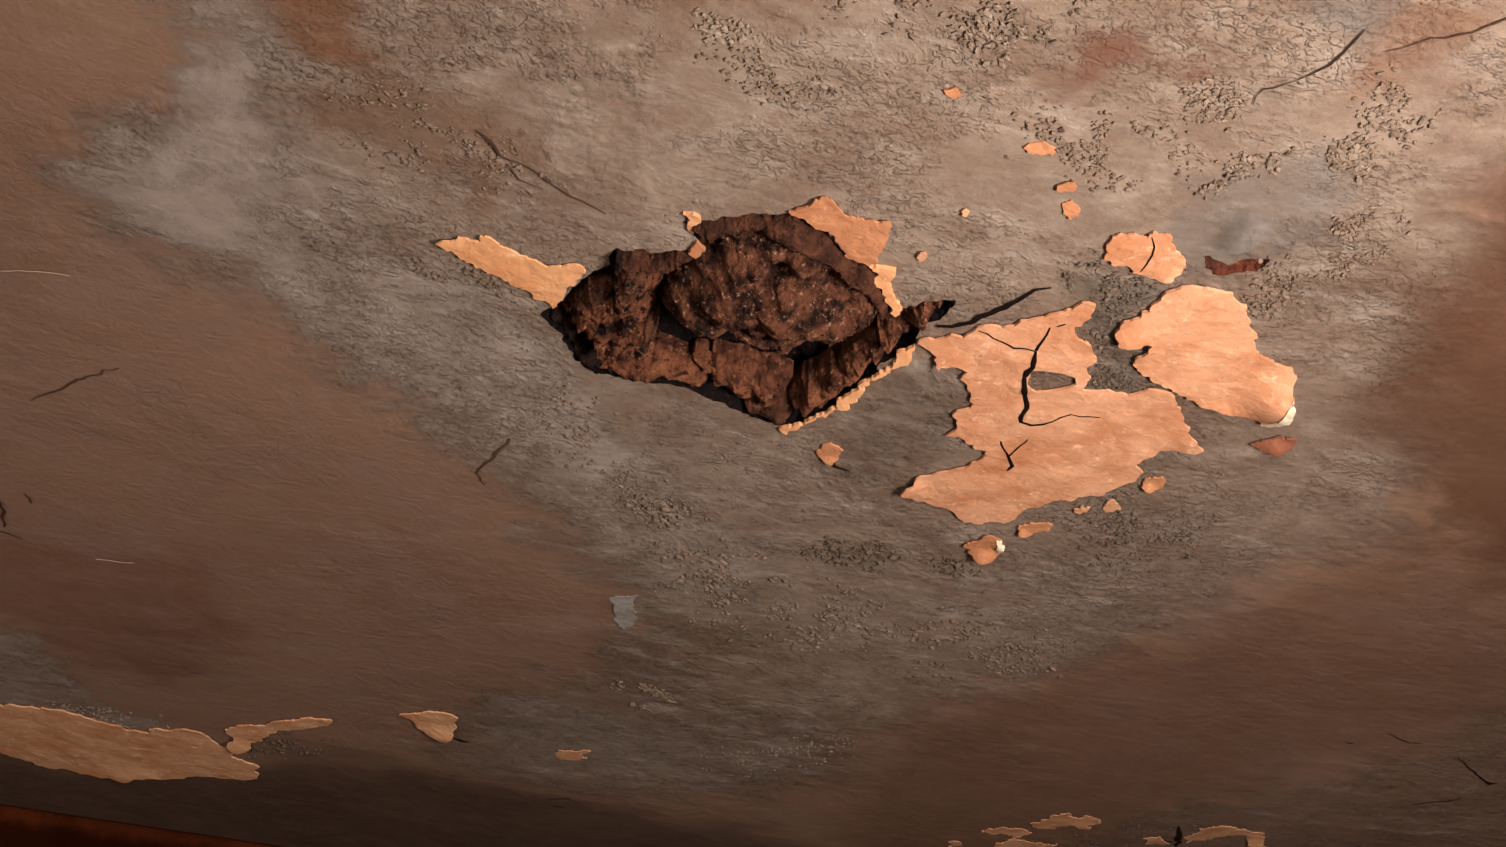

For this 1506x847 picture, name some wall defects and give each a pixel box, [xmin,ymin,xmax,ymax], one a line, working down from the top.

crack [1253,18,1506,105]
crack [937,287,1051,328]
damp [1028,371,1076,391]
spalling [413,196,1390,654]
damp [489,449,657,588]
damp [0,632,158,729]
peeling [0,701,333,783]
peeling [399,710,458,743]
peeling [982,813,1101,847]
peeling [1143,825,1266,847]